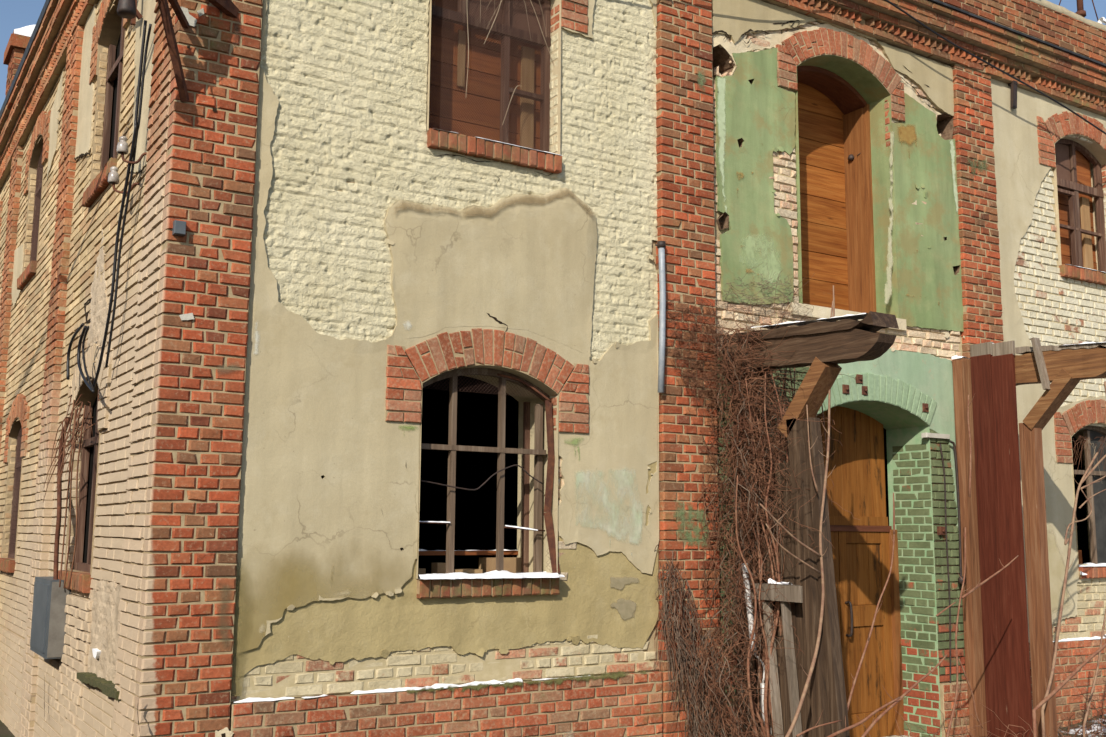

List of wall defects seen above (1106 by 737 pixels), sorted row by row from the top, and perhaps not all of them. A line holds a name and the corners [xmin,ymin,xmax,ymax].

flaking render [712,24,954,140]
peeling [260,0,658,363]
spalling [769,146,798,228]
spalling [716,212,729,230]
peeling [1014,168,1106,346]
spalling [716,301,826,344]
spalling [877,328,965,361]
peeling [1060,378,1106,407]
spalling [552,456,568,512]
spalling [231,536,660,702]
peeling [1052,579,1106,639]